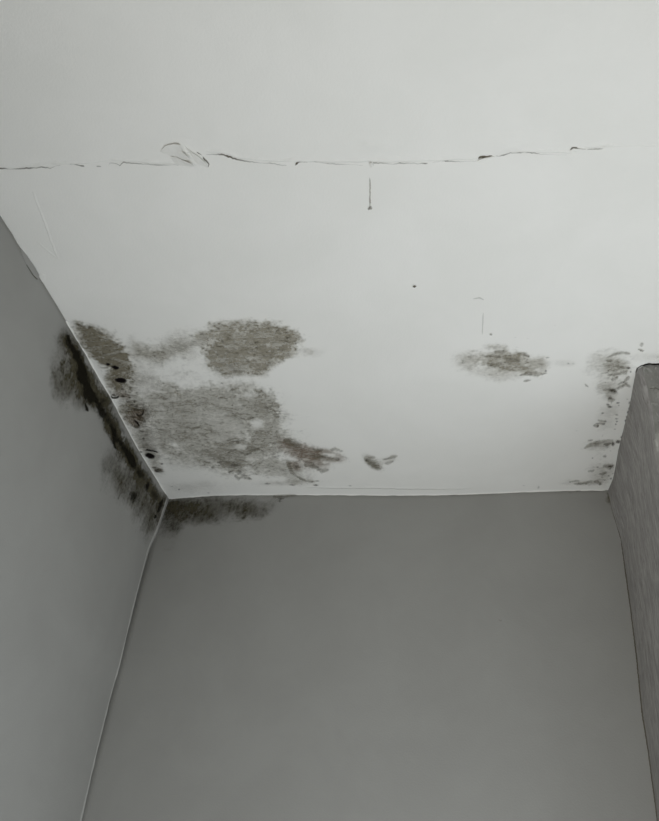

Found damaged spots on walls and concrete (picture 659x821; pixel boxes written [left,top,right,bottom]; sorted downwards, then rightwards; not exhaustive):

damp [480,350,546,382]
damp [598,353,630,408]
damp [52,321,342,533]